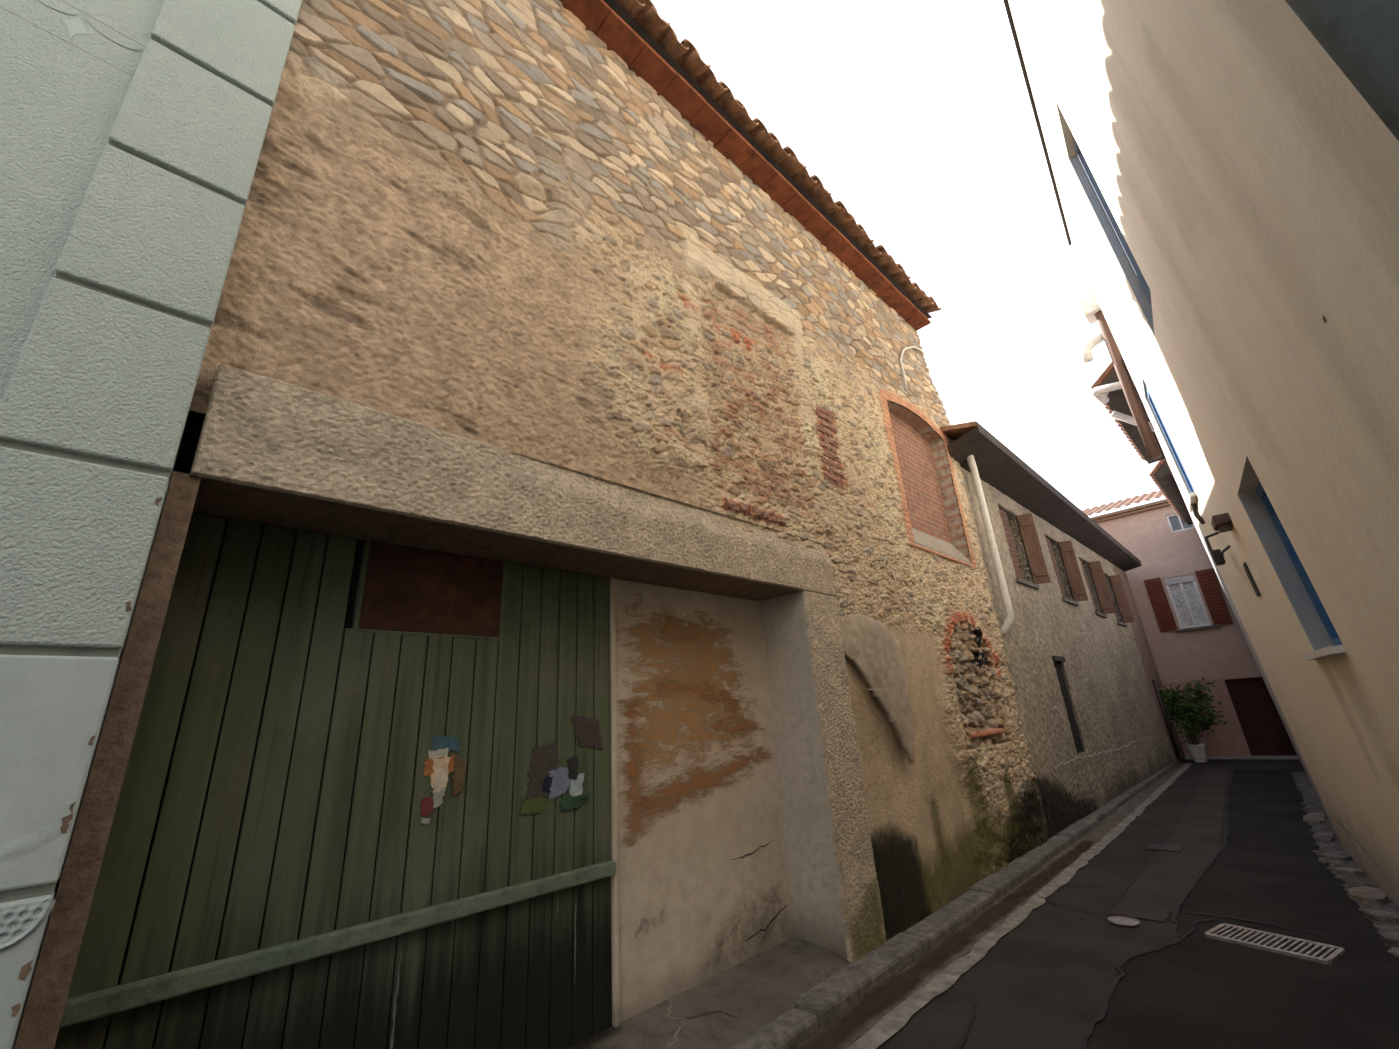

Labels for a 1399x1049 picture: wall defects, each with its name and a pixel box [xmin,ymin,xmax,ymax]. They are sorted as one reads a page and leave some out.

crack [740,903,789,944]
leakage [793,831,1094,1049]